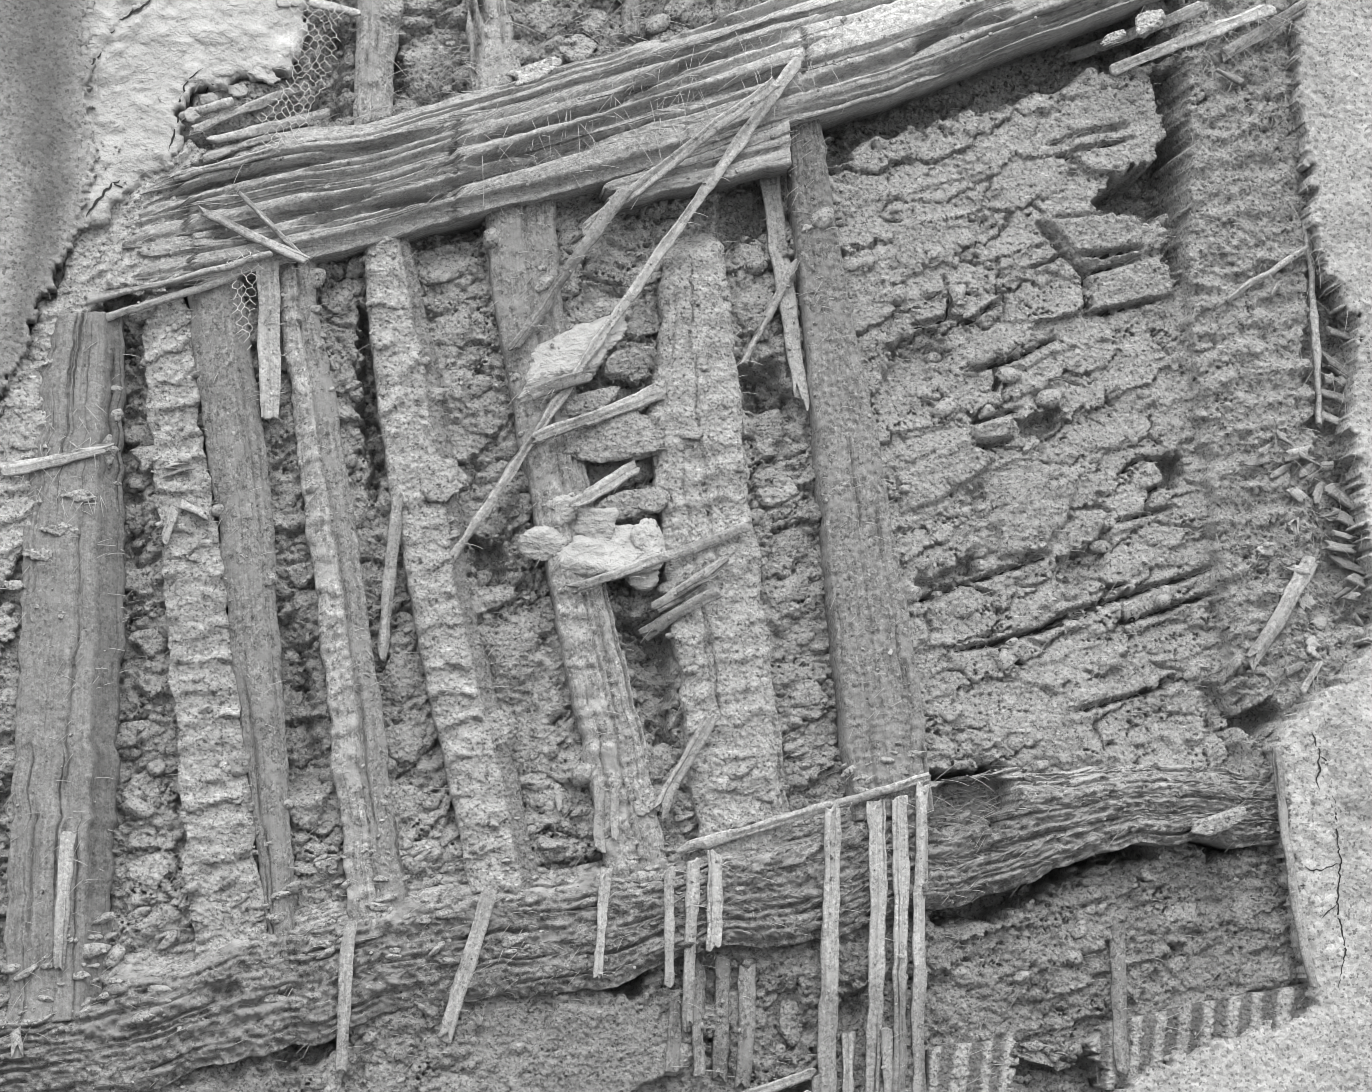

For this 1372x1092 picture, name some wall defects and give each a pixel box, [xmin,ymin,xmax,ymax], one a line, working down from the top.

flaking render [91,0,151,65]
flaking render [1101,9,1166,47]
flaking render [184,43,291,123]
crack [914,293,999,329]
crack [1035,244,1138,319]
crack [967,342,1052,450]
flaking render [2,580,27,591]
crack [913,558,1044,602]
crack [954,570,1215,665]
flaking render [1297,594,1327,648]
crack [1305,733,1347,988]
flaking render [1009,1040,1049,1083]